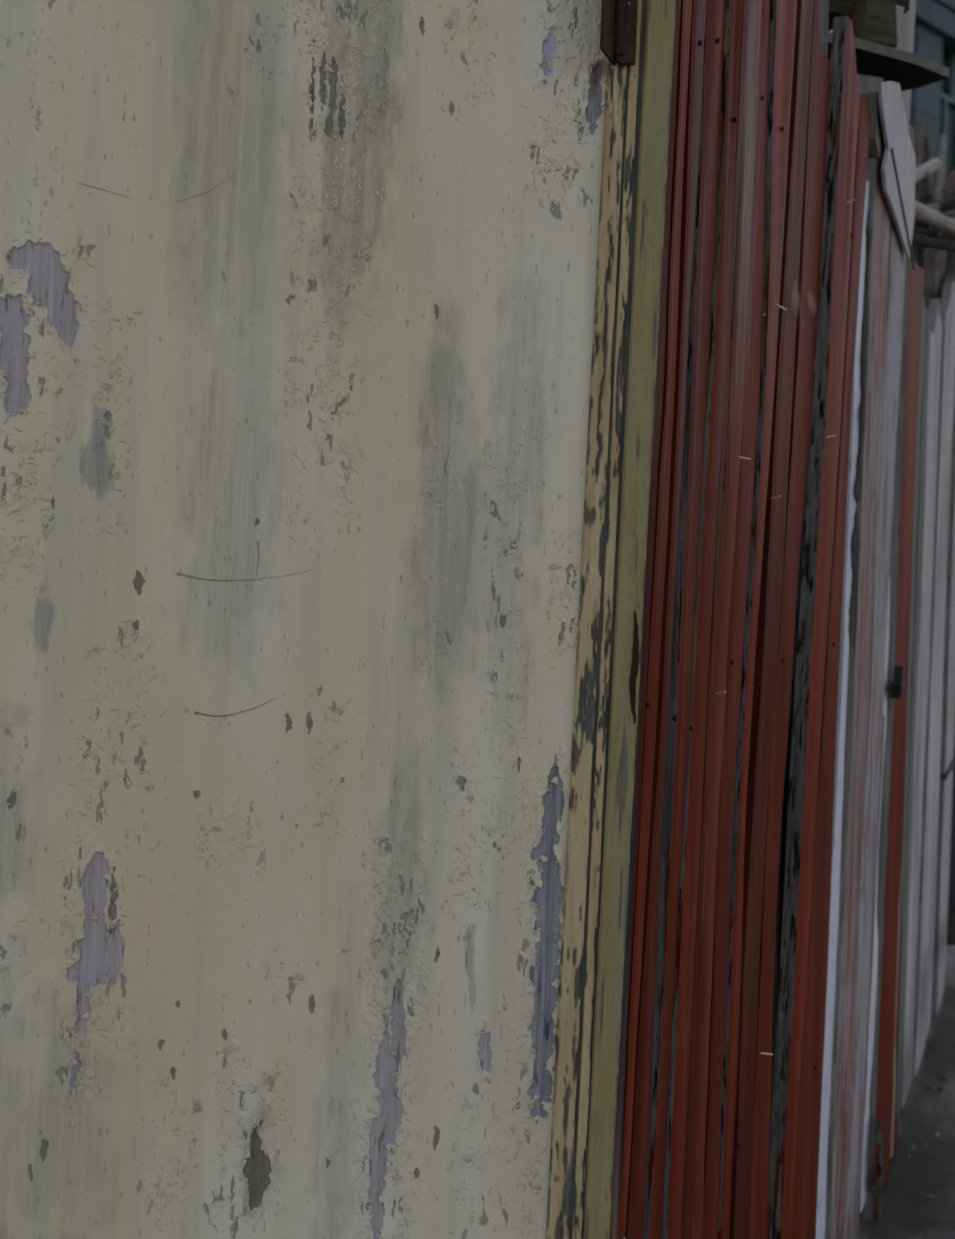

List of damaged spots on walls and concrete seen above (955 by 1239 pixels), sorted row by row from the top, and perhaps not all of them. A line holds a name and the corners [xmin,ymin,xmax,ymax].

peeling [519,0,607,231]
peeling [133,570,146,596]
peeling [540,521,583,661]
peeling [3,787,21,809]
peeling [285,685,351,834]
peeling [28,1139,49,1181]
peeling [146,1029,297,1239]